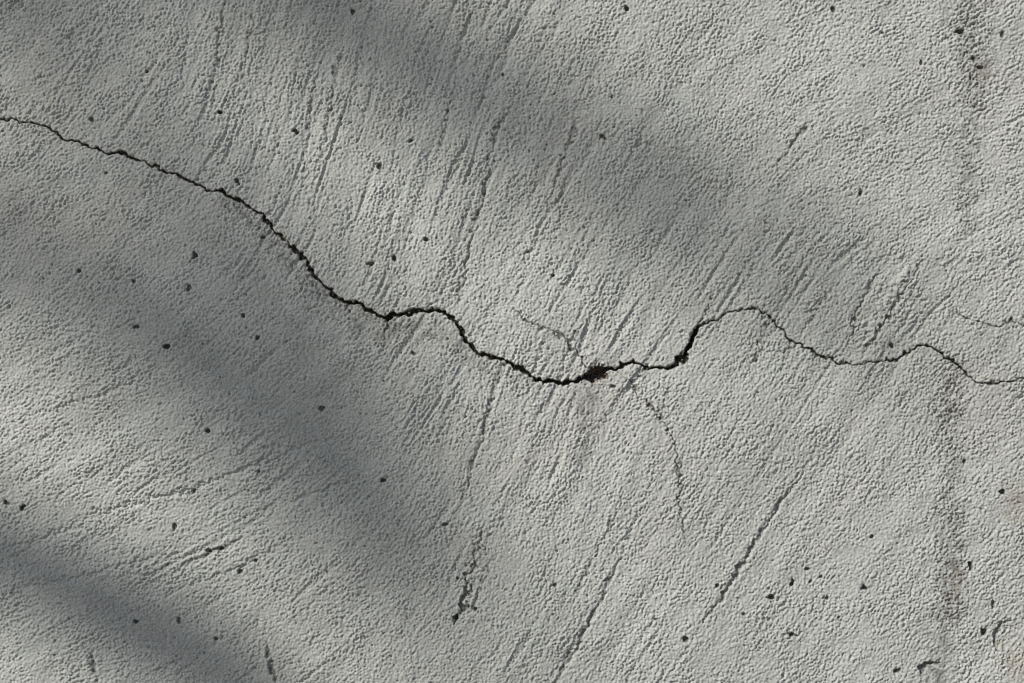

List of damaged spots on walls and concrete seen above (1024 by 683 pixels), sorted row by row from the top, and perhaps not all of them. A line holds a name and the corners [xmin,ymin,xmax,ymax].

crack [0,118,1020,532]